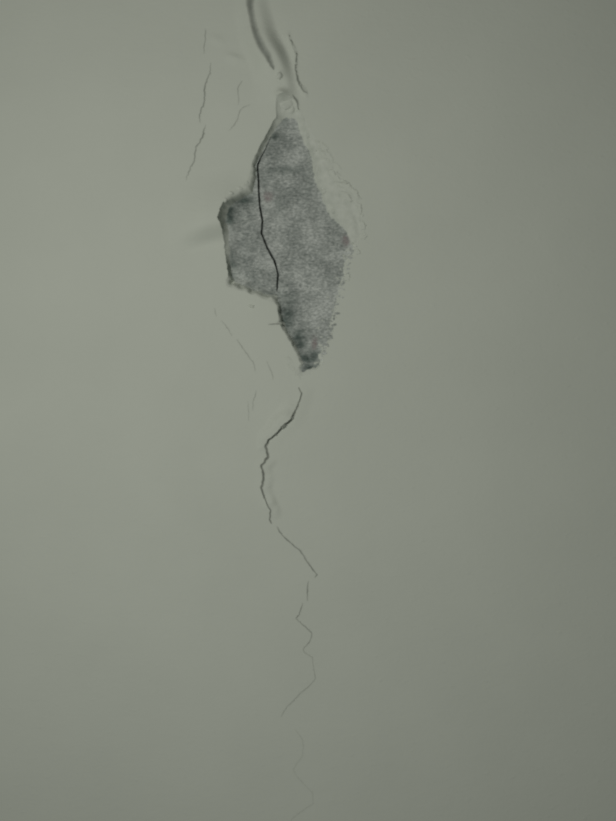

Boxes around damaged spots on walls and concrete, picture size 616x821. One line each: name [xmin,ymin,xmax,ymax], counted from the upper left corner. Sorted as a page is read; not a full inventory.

crack [186,30,211,180]
crack [245,0,307,109]
spalling [217,93,362,376]
crack [260,387,318,717]